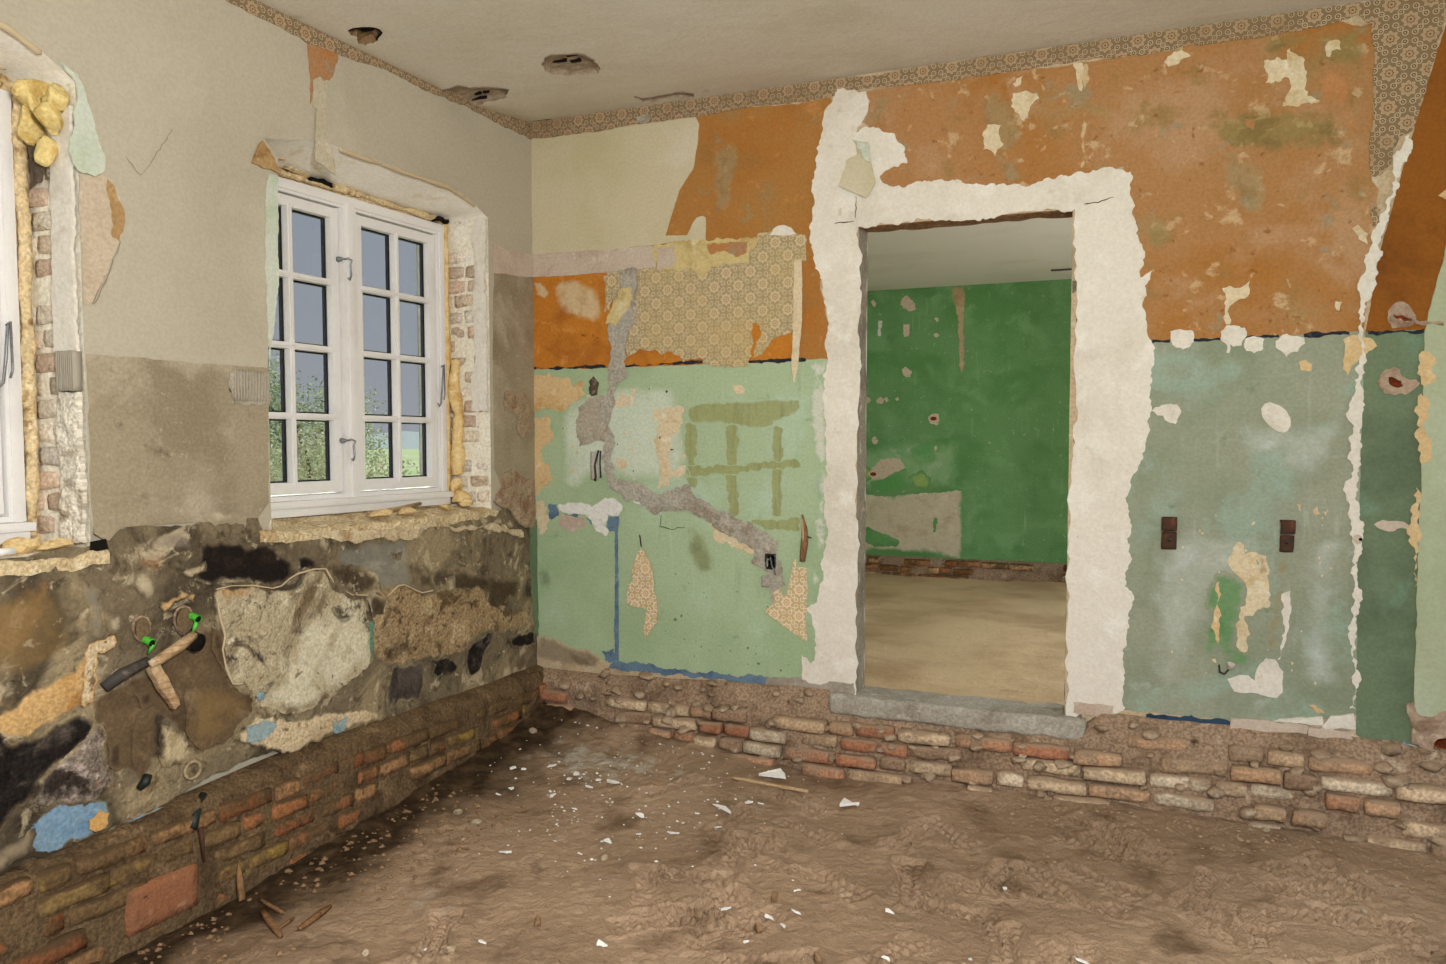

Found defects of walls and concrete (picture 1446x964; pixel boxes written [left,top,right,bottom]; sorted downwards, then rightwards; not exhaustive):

flaking render [863,90,898,126]
peeling [973,83,1025,182]
peeling [1186,24,1375,157]
peeling [1136,211,1182,270]
peeling [533,276,608,352]
spalling [900,295,916,337]
flaking render [1387,301,1444,329]
peeling [1377,351,1437,465]
peeling [805,359,828,594]
peeling [1407,488,1422,586]
flaking render [0,567,531,808]
flaking render [1406,701,1446,751]